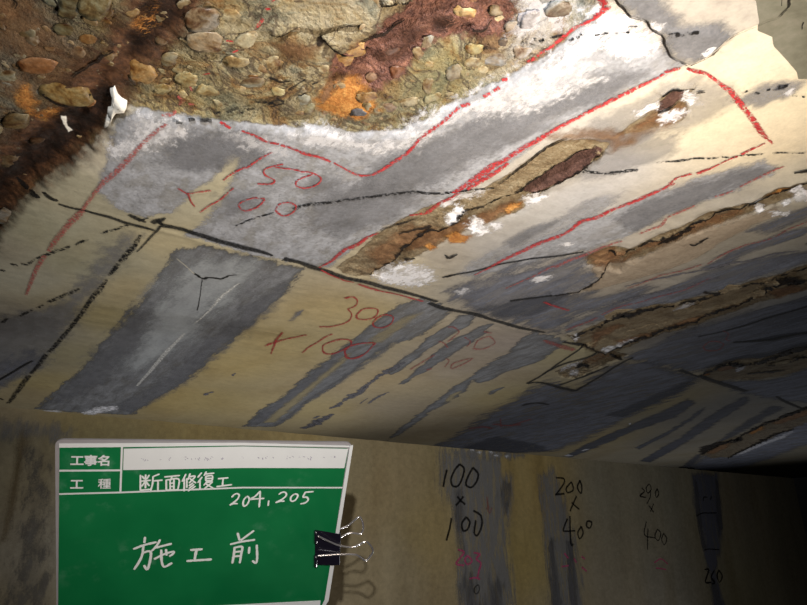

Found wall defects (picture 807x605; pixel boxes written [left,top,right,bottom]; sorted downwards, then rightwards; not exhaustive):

spalling [0,0,168,167]
spalling [124,0,595,132]
rust [314,0,516,120]
spalling [622,89,705,134]
water stain [34,3,685,415]
spalling [337,139,610,288]
spalling [551,170,807,297]
water stain [0,239,126,386]
spalling [556,265,807,383]
water stain [436,296,807,605]
spalling [699,406,807,458]